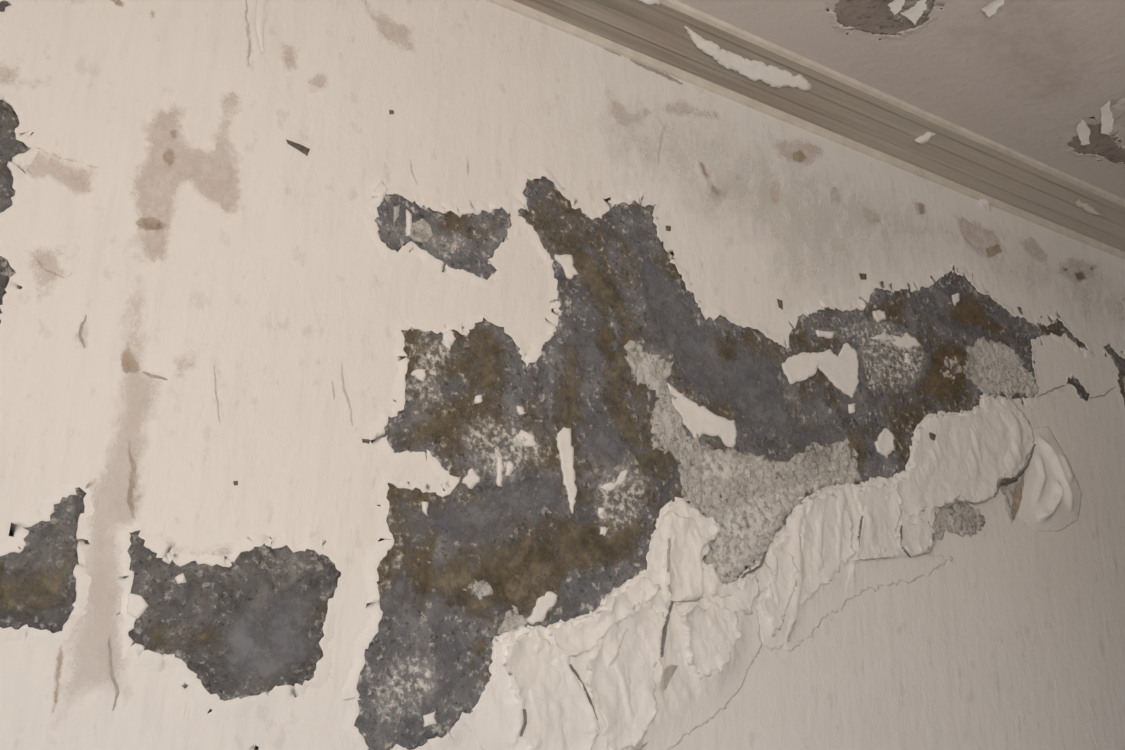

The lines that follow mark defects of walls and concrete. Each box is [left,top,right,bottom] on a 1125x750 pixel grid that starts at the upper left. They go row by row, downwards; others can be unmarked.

spalling [823,0,945,41]
peeling [982,0,1005,17]
peeling [683,26,812,91]
spalling [1059,100,1125,169]
spalling [0,84,43,348]
spalling [110,164,1125,750]
spalling [0,471,98,647]